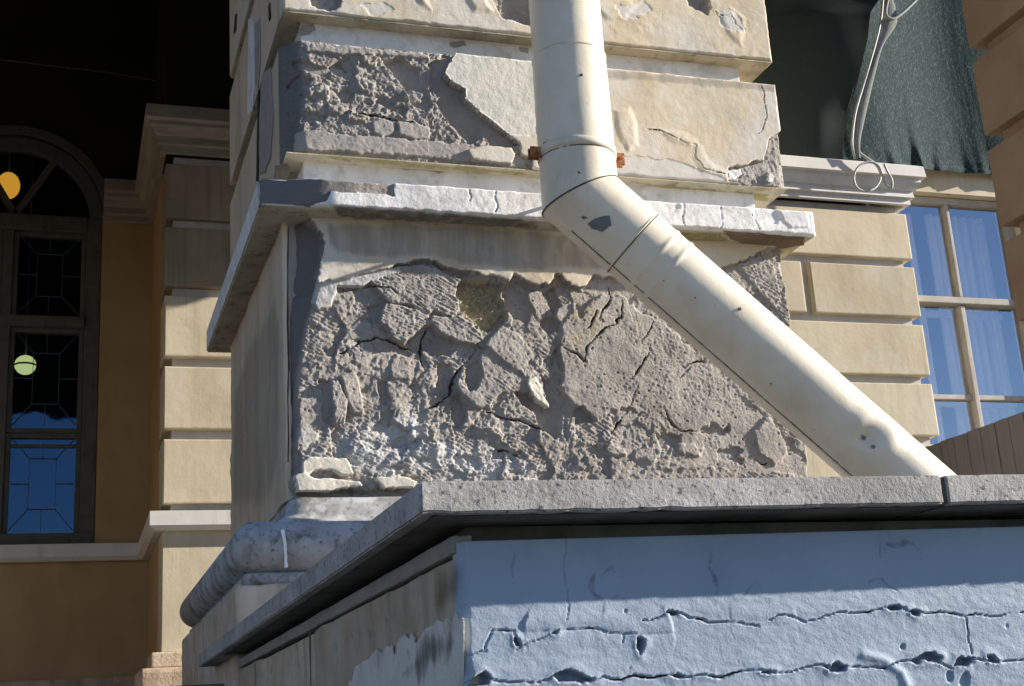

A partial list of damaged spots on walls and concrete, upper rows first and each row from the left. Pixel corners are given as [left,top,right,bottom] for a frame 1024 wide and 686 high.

peeling [615,0,653,20]
peeling [687,0,746,32]
flaking render [247,17,808,503]
crack [569,291,623,362]
crack [339,332,426,367]
crack [864,604,975,630]
peeling [348,612,465,686]
crack [469,672,491,686]
crack [553,637,684,684]
crack [710,670,774,678]
crack [823,662,848,672]
crack [880,651,1000,669]